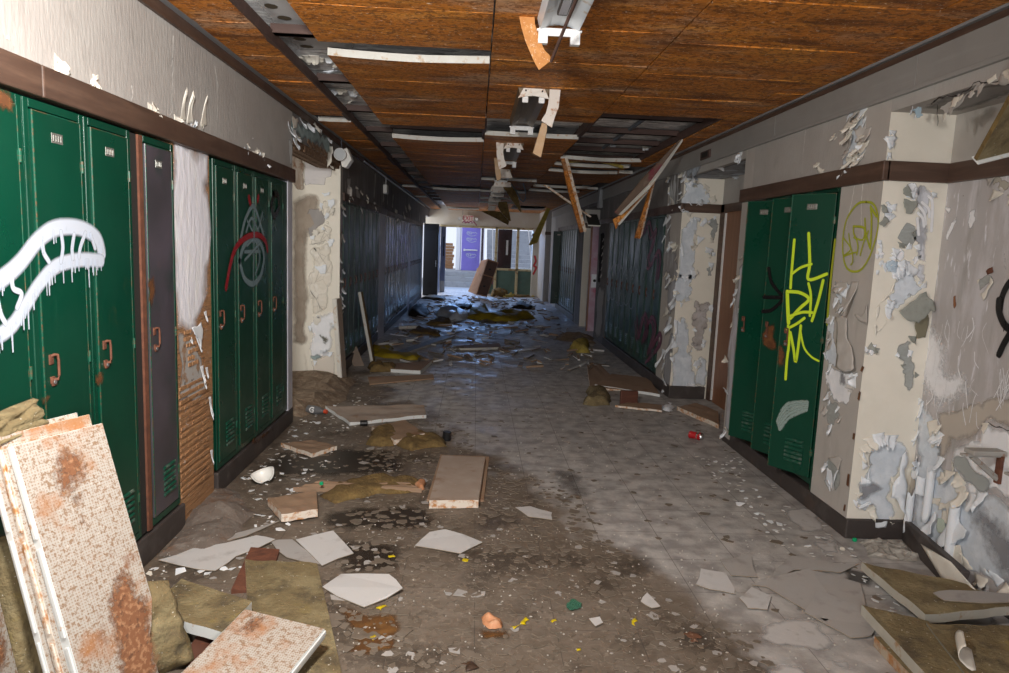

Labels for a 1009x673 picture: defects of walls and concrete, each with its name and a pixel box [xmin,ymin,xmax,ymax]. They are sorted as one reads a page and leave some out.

corrosion [0,90,13,109]
peeling [572,118,691,150]
peeling [836,108,872,180]
peeling [883,130,897,160]
spalling [288,116,377,366]
peeling [174,144,214,500]
peeling [655,151,746,439]
peeling [821,183,936,435]
peeling [977,267,993,301]
peeling [820,456,842,491]
peeling [853,398,1009,593]